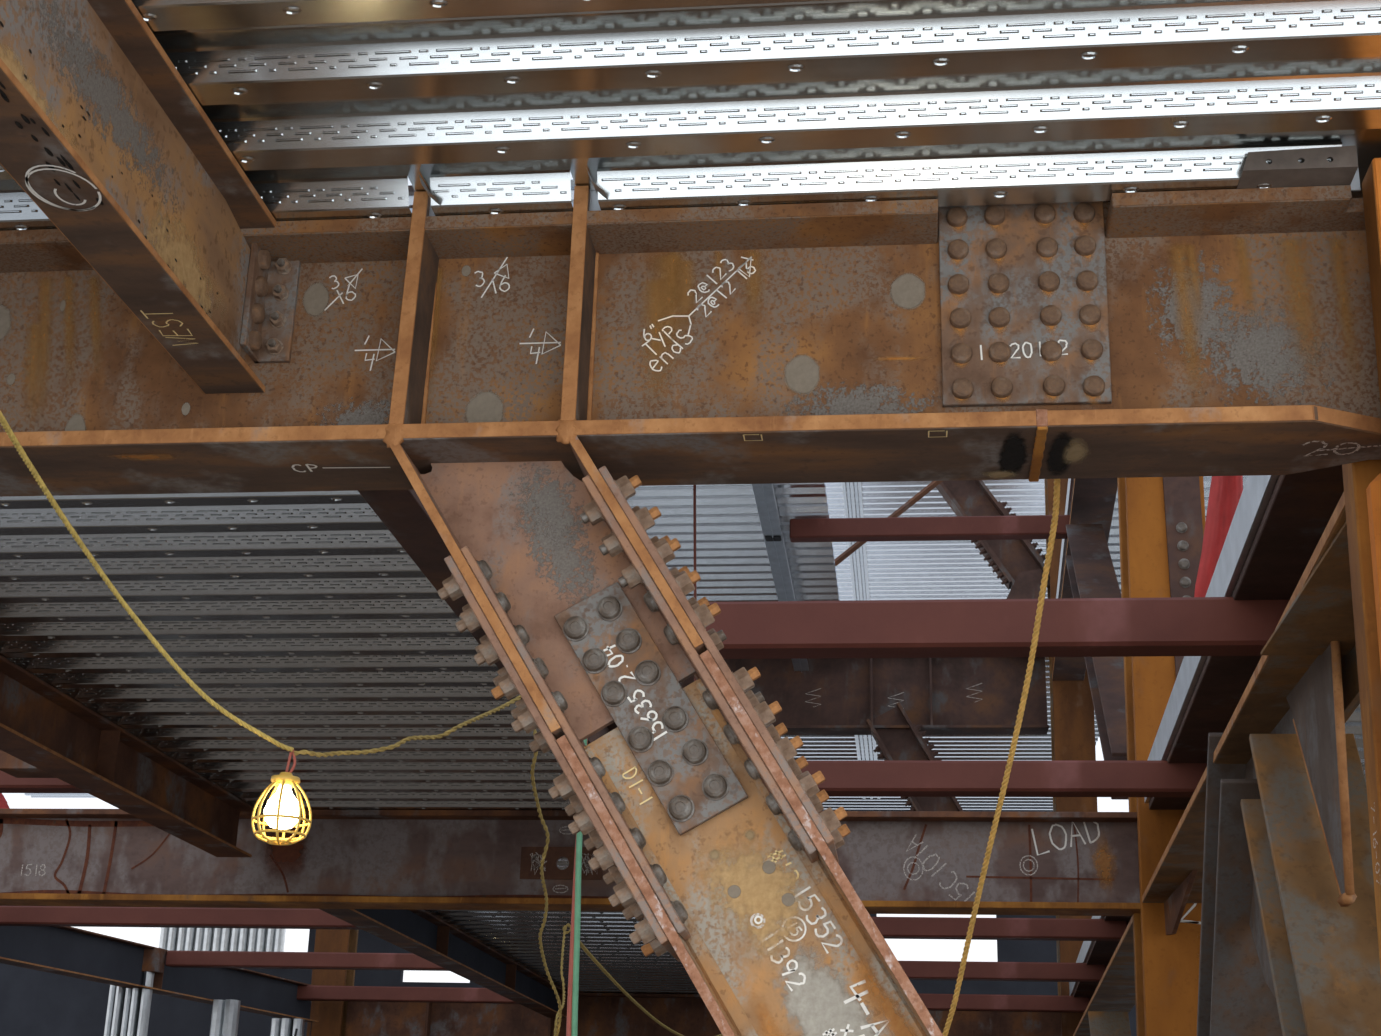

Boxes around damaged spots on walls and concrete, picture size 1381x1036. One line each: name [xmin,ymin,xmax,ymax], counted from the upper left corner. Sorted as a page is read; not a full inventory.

corrosion [147,215,211,311]
corrosion [0,818,153,894]
corrosion [198,821,370,896]
corrosion [710,850,799,948]
corrosion [903,824,927,890]
corrosion [966,825,1115,902]
corrosion [865,966,914,1036]